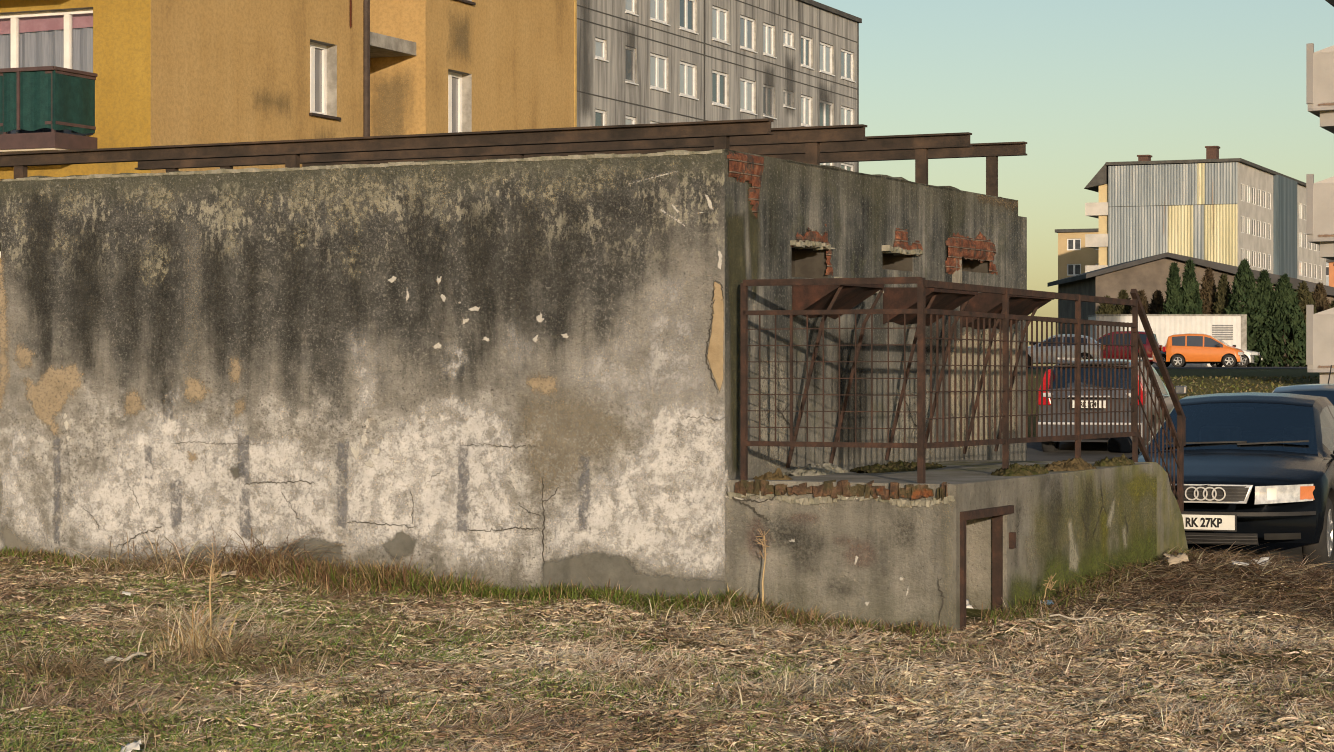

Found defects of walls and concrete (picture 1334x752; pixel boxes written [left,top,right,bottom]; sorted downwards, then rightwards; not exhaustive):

flaking render [727,151,764,217]
water stain [28,196,52,343]
water stain [76,229,99,366]
flaking render [791,224,833,275]
flaking render [893,228,923,256]
flaking render [945,231,998,275]
flaking render [0,259,81,437]
peeling [588,282,724,405]
crack [464,441,542,449]
crack [82,485,162,555]
crack [465,478,559,566]
water stain [1051,486,1092,569]